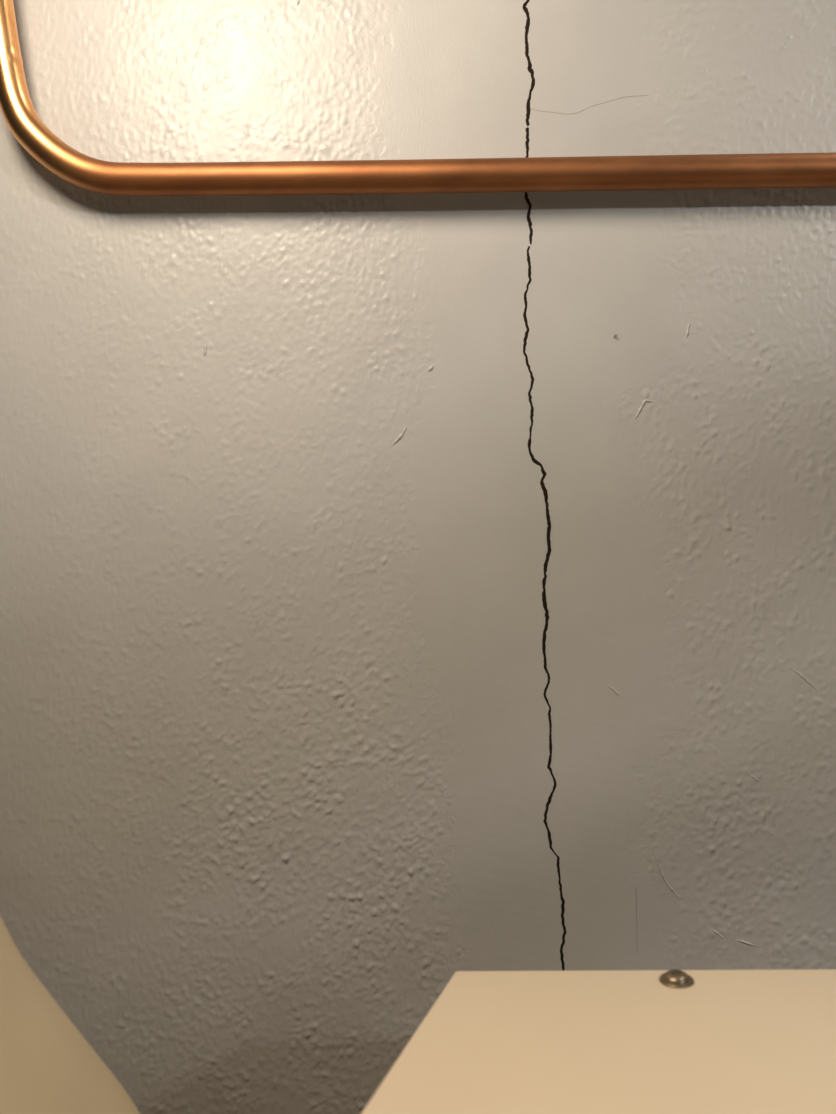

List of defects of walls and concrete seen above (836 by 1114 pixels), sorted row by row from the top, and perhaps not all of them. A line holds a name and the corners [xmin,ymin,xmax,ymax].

crack [523,0,647,158]
crack [523,192,567,971]